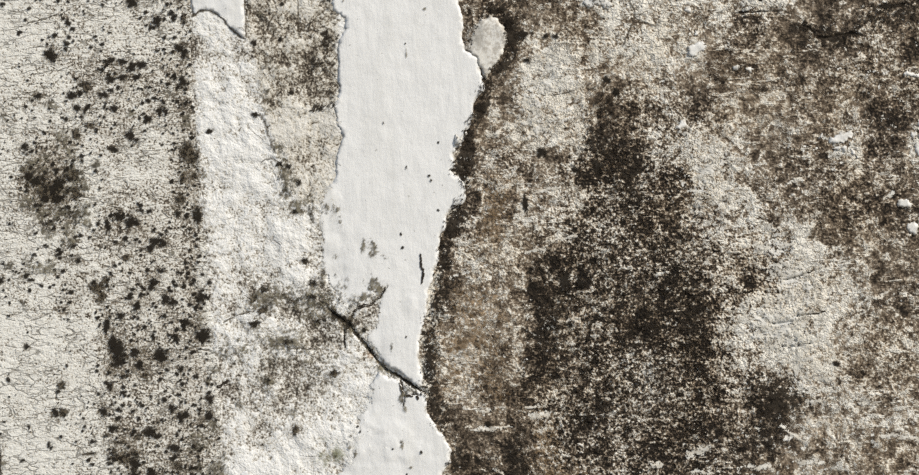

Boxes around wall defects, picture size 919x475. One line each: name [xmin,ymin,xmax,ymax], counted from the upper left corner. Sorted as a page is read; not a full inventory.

peeling [190,0,246,38]
damp [797,0,919,47]
peeling [314,0,508,475]
damp [374,0,732,475]
crack [328,287,426,405]
damp [878,432,919,443]